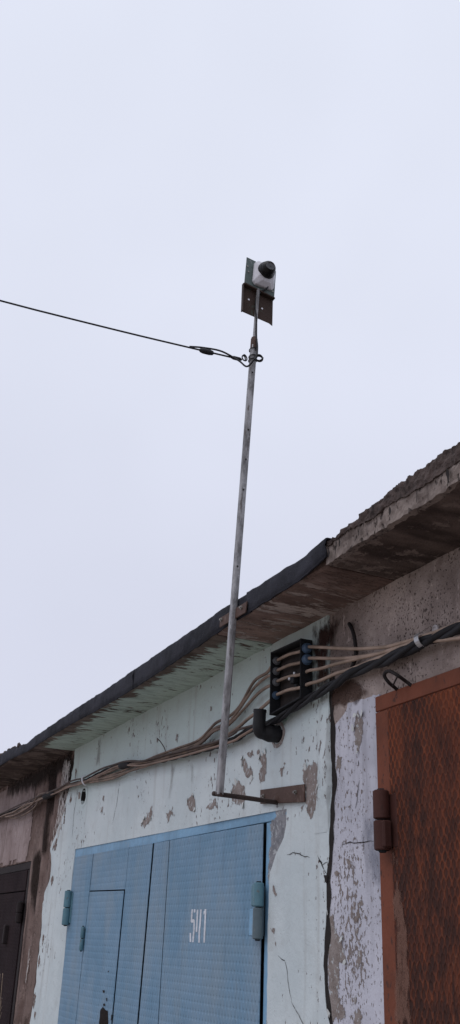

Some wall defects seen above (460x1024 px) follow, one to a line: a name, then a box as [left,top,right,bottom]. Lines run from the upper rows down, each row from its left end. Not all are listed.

peeling [351,710,363,754]
damp [7,751,74,914]
peeling [186,793,217,812]
peeling [230,748,266,808]
spalling [268,805,289,896]
peeling [301,762,318,819]
crack [287,677,369,1024]
peeling [326,900,363,1024]
corrosion [393,882,411,1024]